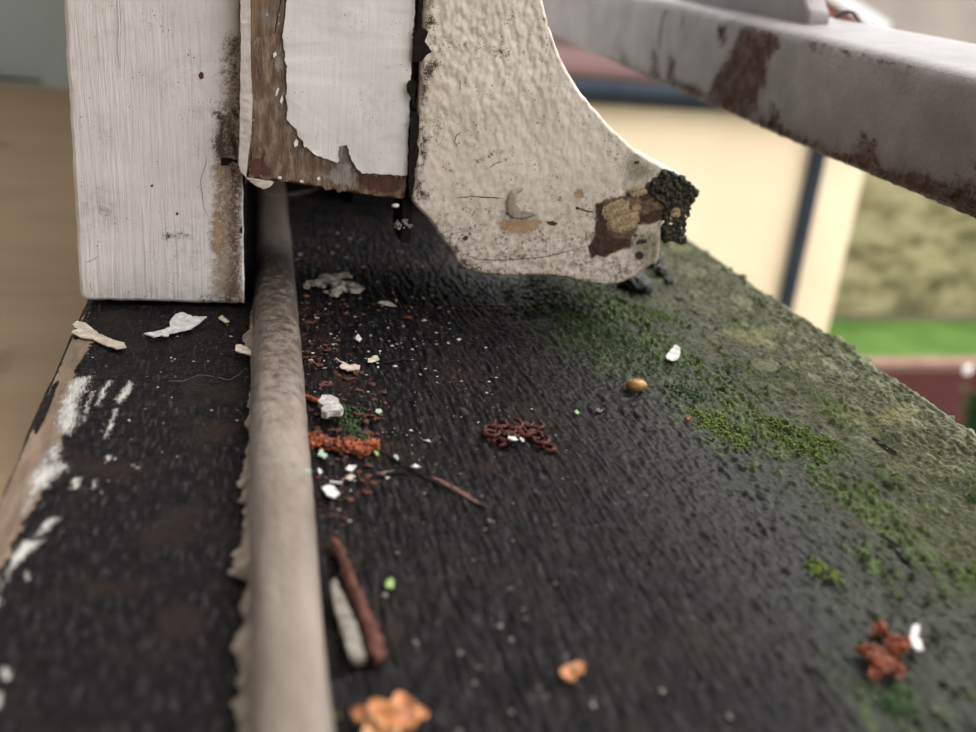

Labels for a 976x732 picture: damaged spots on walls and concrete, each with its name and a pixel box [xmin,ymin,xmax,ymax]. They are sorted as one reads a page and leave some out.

water stain [201,37,243,303]
peeling [249,33,407,208]
peeling [588,169,692,260]
corrosion [611,21,976,218]
peeling [144,312,207,337]
peeling [0,312,134,588]